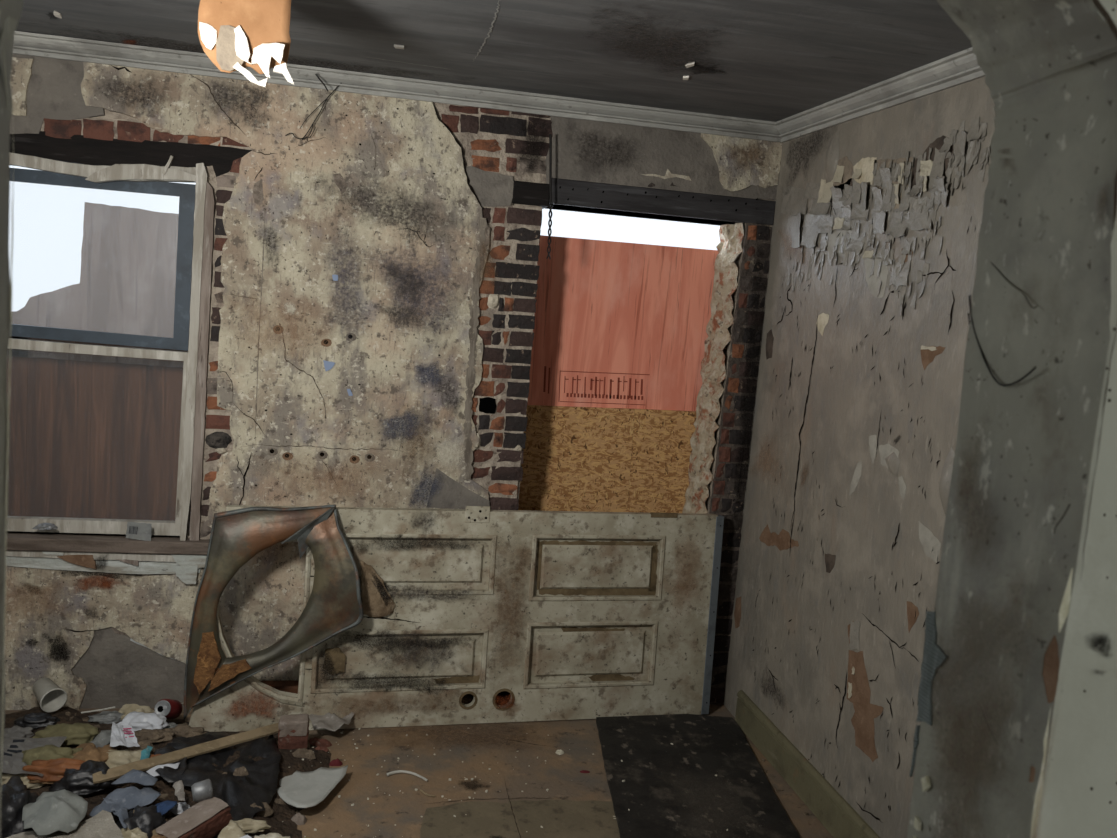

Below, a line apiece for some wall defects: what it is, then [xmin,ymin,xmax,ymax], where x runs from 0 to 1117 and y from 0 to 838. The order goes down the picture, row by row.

flaking render [10,54,252,539]
flaking render [426,102,967,510]
crack [777,200,895,555]
spalling [0,184,14,837]
peeling [142,554,207,584]
peeling [537,540,658,596]
flaking render [709,223,774,704]
peeling [919,521,941,563]
flaking render [72,627,186,709]
peeling [434,675,480,684]
peeling [846,650,884,762]
flaking render [1042,635,1060,703]